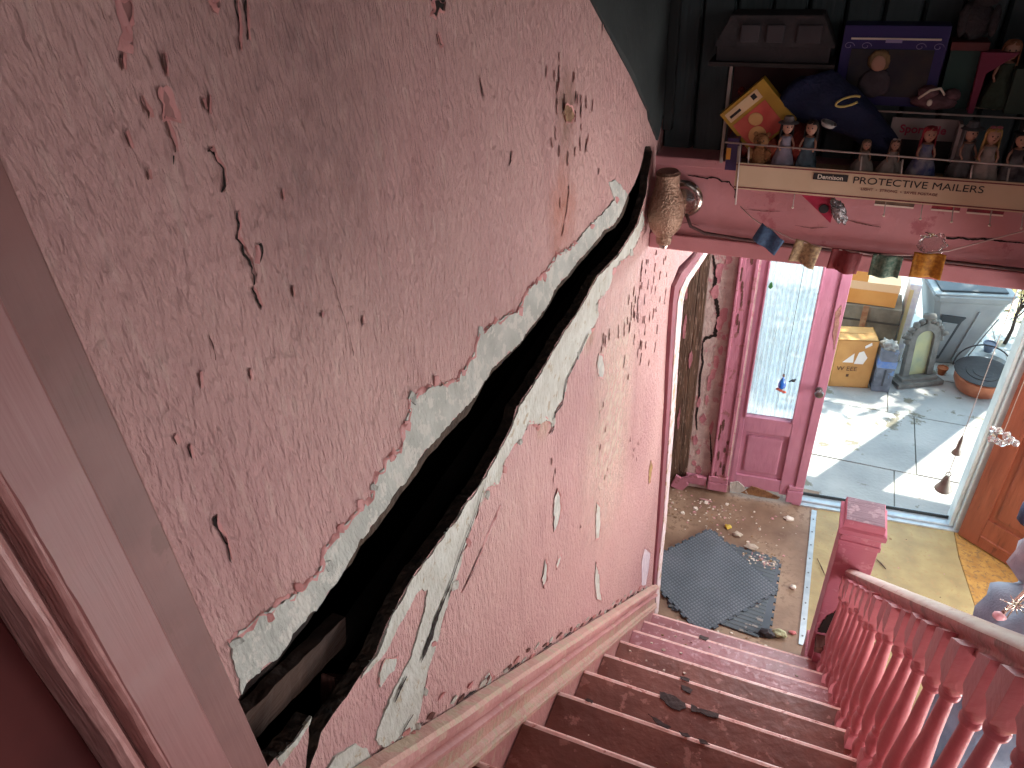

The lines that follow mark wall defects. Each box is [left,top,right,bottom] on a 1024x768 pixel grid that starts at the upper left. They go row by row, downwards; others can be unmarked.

peeling [115,0,135,70]
spalling [545,52,594,159]
spalling [596,250,667,381]
crack [695,255,720,464]
crack [227,146,652,768]
peeling [551,463,562,533]
spalling [403,548,651,736]